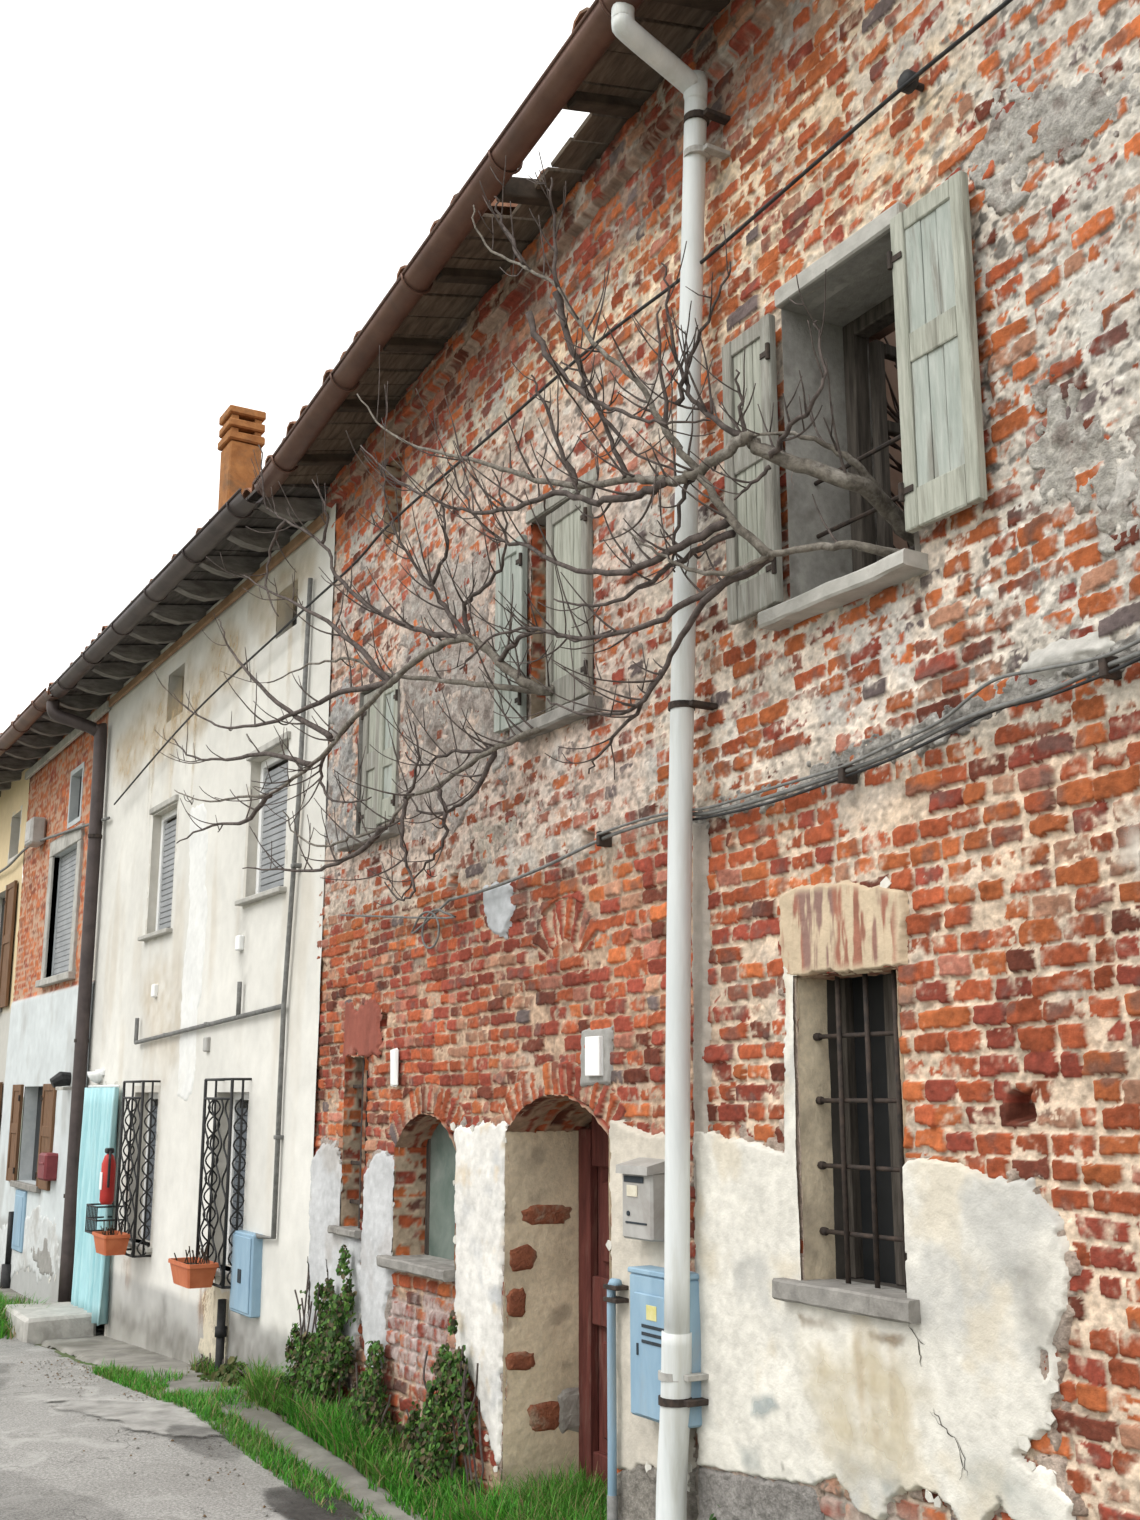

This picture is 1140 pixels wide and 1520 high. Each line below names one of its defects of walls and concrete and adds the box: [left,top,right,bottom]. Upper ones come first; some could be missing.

peeling [606,1119,665,1472]
peeling [687,967,1089,1520]
crack [930,1412,968,1480]